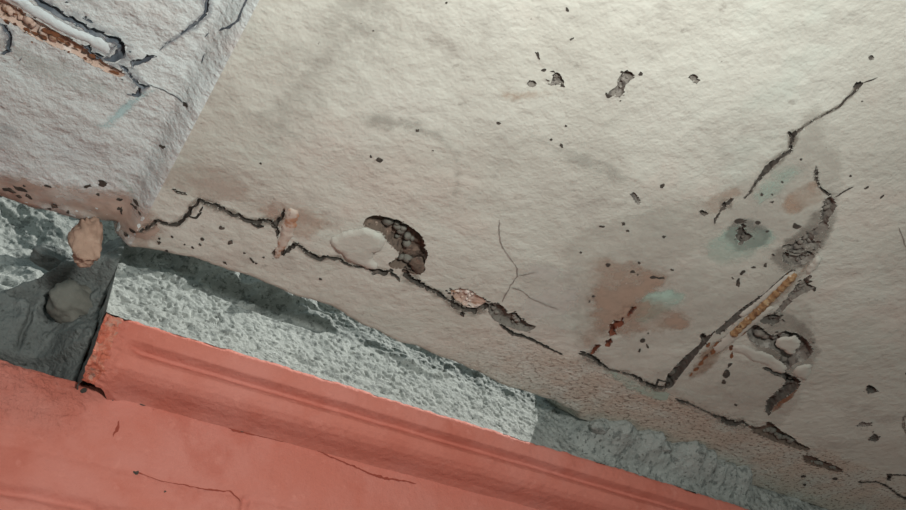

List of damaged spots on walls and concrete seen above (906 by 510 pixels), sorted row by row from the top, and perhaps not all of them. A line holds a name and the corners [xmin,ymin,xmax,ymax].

crack [0,23,22,61]
crack [35,0,247,103]
spalling [605,70,643,102]
crack [699,77,878,224]
spalling [330,215,428,275]
crack [138,189,749,428]
spalling [445,288,536,333]
rust [591,306,637,354]
spalling [666,197,842,486]
crack [229,428,283,442]
spalling [857,421,880,441]
crack [318,451,416,484]